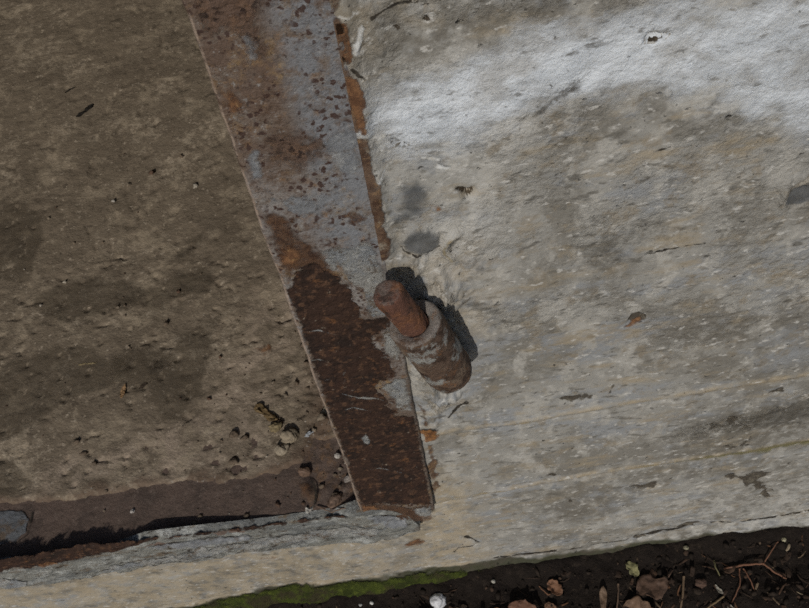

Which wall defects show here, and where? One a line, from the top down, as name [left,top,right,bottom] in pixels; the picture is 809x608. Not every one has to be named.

corrosion [329,0,390,261]
corrosion [267,134,326,167]
corrosion [266,213,440,521]
corrosion [230,516,346,532]
corrosion [0,537,158,572]